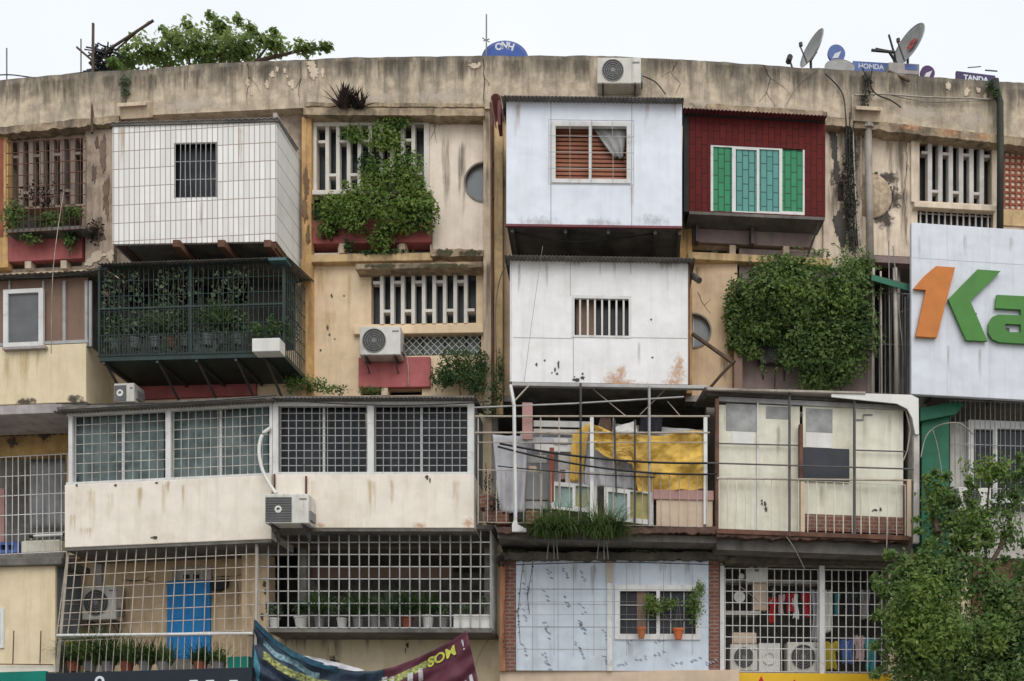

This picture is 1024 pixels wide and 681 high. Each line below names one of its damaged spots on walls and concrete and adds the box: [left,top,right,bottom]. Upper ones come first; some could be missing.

peeling [264,66,295,89]
peeling [306,61,325,80]
flaking render [84,133,115,266]
damp [830,138,860,211]
damp [874,142,902,226]